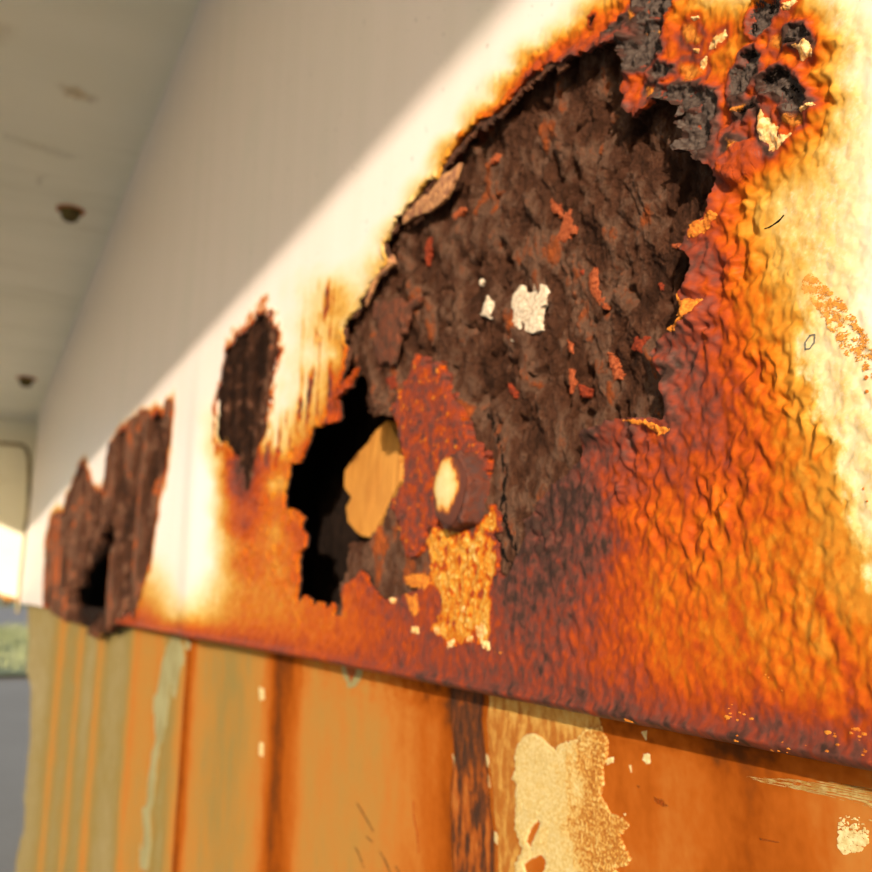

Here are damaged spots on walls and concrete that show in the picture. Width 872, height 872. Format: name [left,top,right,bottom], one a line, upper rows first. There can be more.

spalling [313,379,395,607]
rust [134,0,872,771]
rust [16,385,178,872]
peeling [139,635,191,872]
rust [146,636,270,872]
rust [258,652,455,872]
rust [451,688,499,872]
rust [515,821,546,872]
peeling [486,695,632,872]
rust [599,717,872,872]
peeling [837,816,869,855]